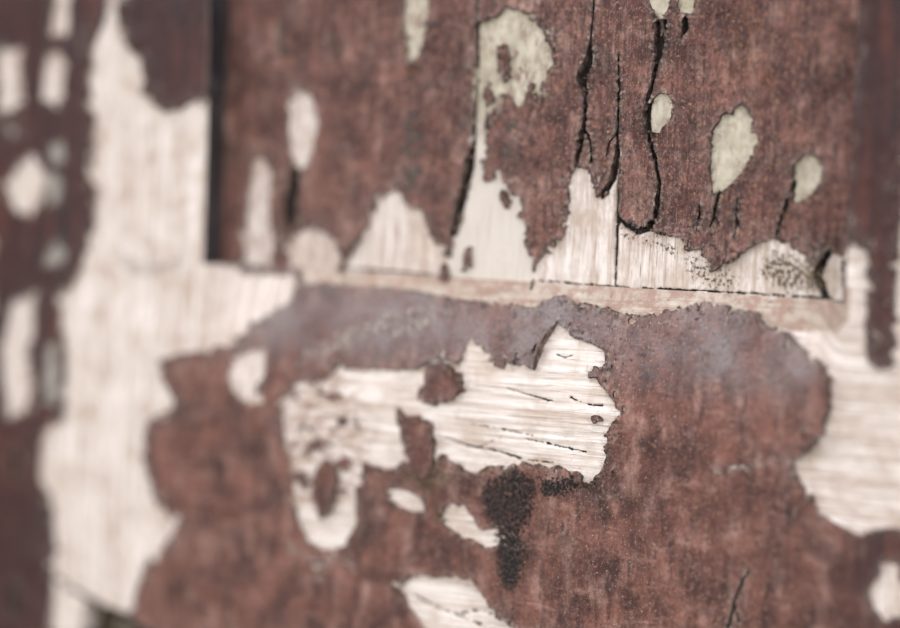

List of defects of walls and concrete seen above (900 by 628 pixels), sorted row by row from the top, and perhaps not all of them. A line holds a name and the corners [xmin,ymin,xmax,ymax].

crack [540,19,832,300]
peeling [39,0,319,628]
crack [333,267,436,276]
peeling [276,0,900,555]
peeling [393,568,510,628]
damp [475,468,585,593]
peeling [861,560,900,622]